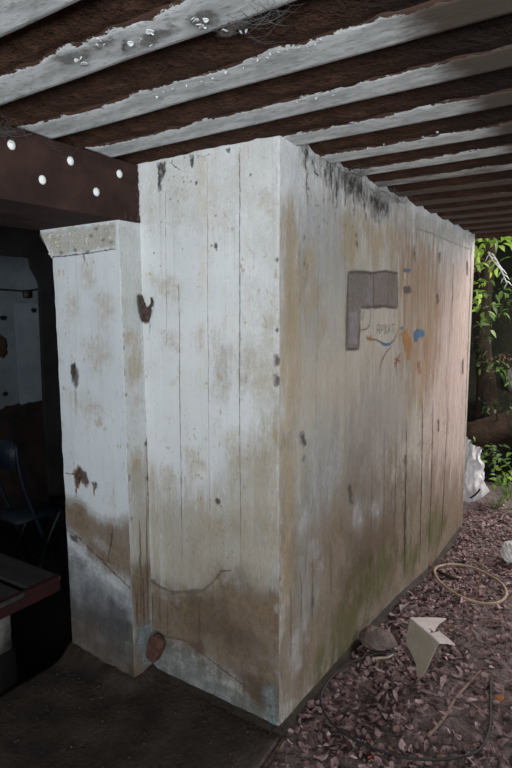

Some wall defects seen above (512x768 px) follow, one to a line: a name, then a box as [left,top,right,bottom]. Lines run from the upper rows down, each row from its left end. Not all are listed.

rust [66,466,97,497]
water stain [65,151,474,724]